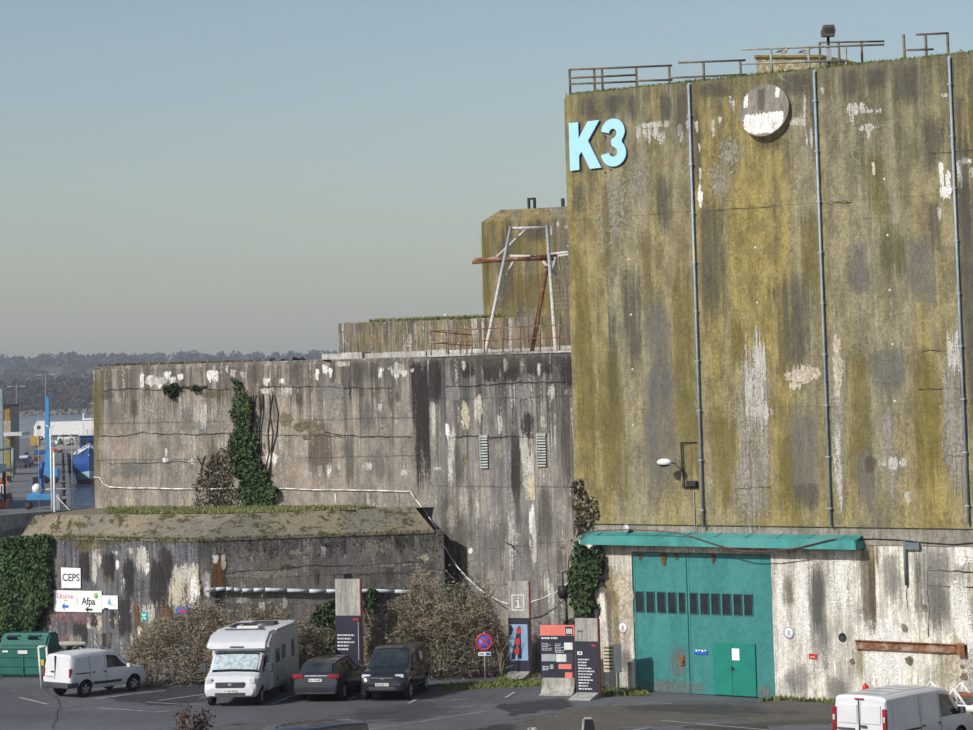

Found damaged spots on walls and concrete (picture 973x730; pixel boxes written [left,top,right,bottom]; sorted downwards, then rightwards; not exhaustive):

water stain [606,94,745,304]
water stain [906,93,973,495]
water stain [207,362,301,432]
water stain [315,359,504,581]
water stain [495,409,552,566]
water stain [733,325,776,528]
spalling [784,364,821,390]
water stain [828,330,847,513]
water stain [58,546,175,650]
peeling [168,562,200,612]
corrosion [210,554,229,614]
water stain [774,548,918,693]